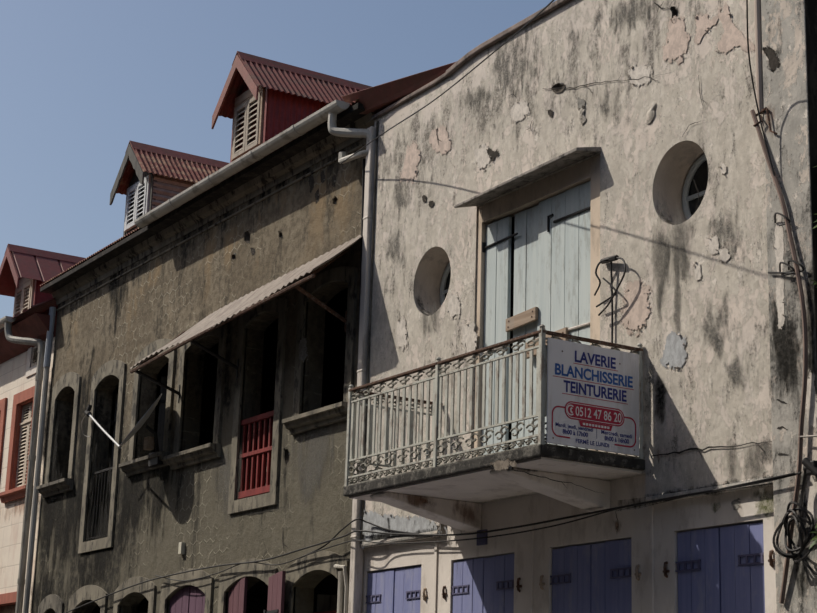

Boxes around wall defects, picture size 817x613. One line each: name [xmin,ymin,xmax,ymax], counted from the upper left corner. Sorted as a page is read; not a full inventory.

damp [611,0,655,32]
spalling [762,46,780,72]
crack [543,72,671,97]
peeling [400,140,421,184]
peeling [429,126,451,155]
peeling [474,142,499,172]
damp [654,212,688,333]
damp [772,264,817,397]
damp [655,376,666,421]
crack [651,426,789,464]
damp [31,350,183,613]